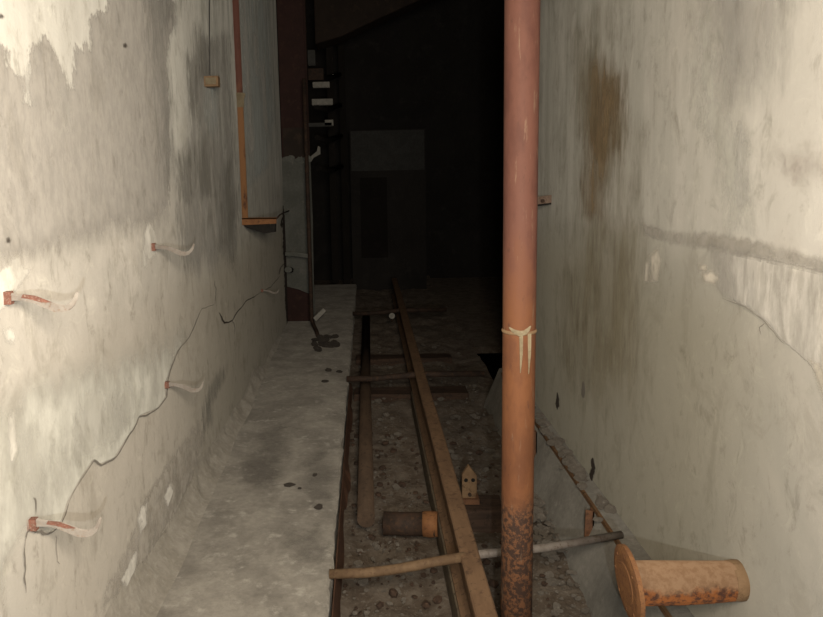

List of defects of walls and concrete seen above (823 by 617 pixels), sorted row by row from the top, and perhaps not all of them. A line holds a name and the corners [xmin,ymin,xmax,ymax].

leakage [0,0,176,254]
corrosion [580,61,620,216]
crack [24,206,288,586]
crack [725,299,783,343]